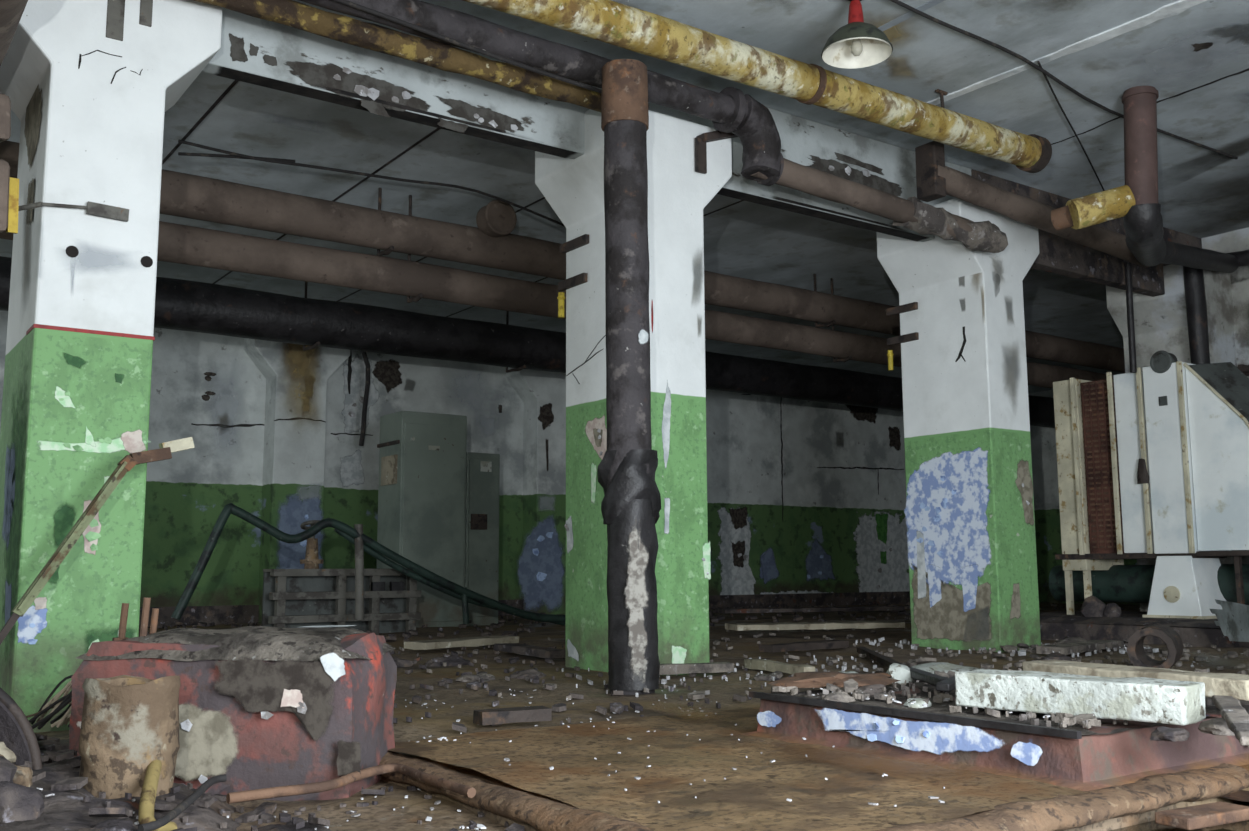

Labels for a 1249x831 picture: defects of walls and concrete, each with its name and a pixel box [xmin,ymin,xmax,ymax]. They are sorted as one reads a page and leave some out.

peeling [229,33,524,133]
peeling [807,152,902,196]
water stain [1196,139,1249,165]
rust [285,343,316,413]
peeling [341,355,415,434]
peeling [38,426,148,453]
peeling [54,500,101,555]
peeling [518,516,573,609]
peeling [702,507,835,595]
peeling [853,447,992,642]
peeling [5,581,47,644]
peeling [672,646,687,664]